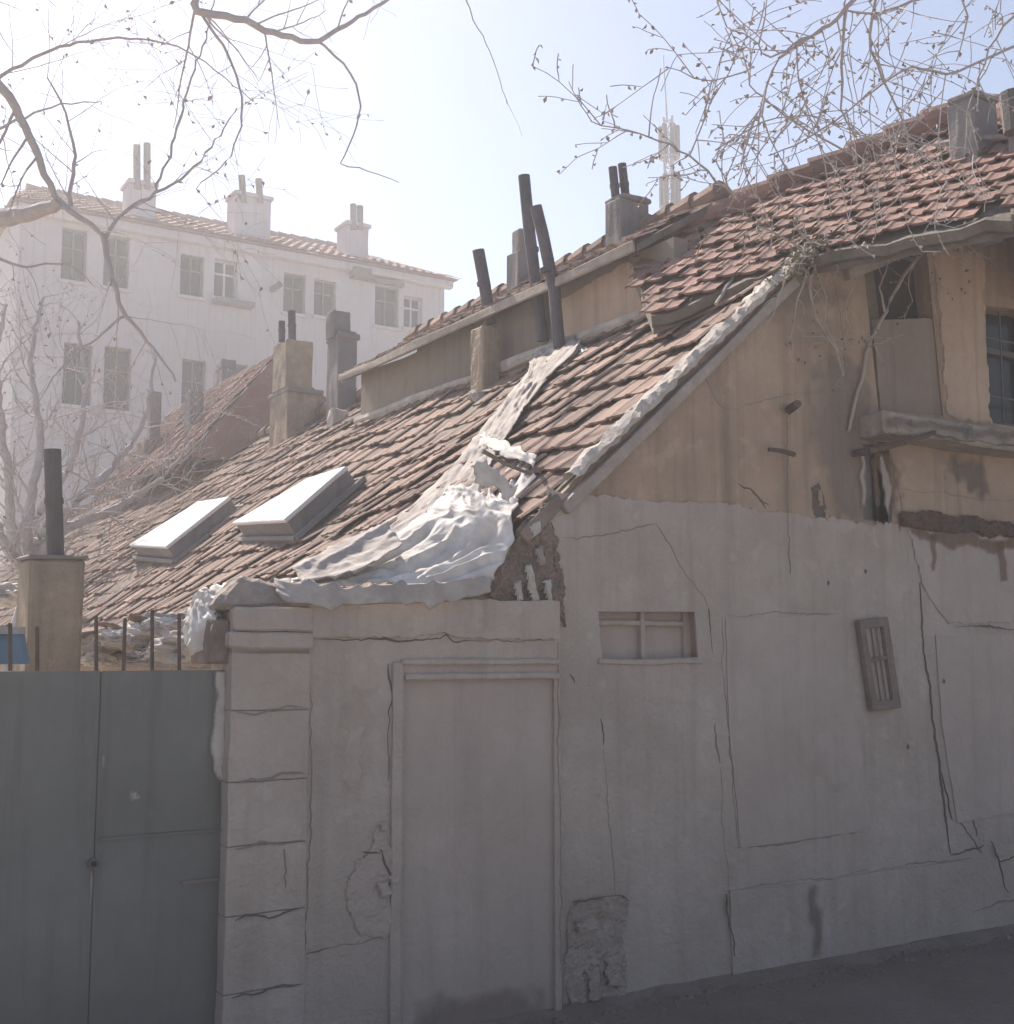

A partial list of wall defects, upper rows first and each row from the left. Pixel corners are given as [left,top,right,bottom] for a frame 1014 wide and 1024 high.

spalling [487,492,566,619]
crack [235,695,391,955]
crack [326,634,536,780]
crack [557,658,629,1009]
crack [551,522,1014,956]
crack [232,984,300,998]